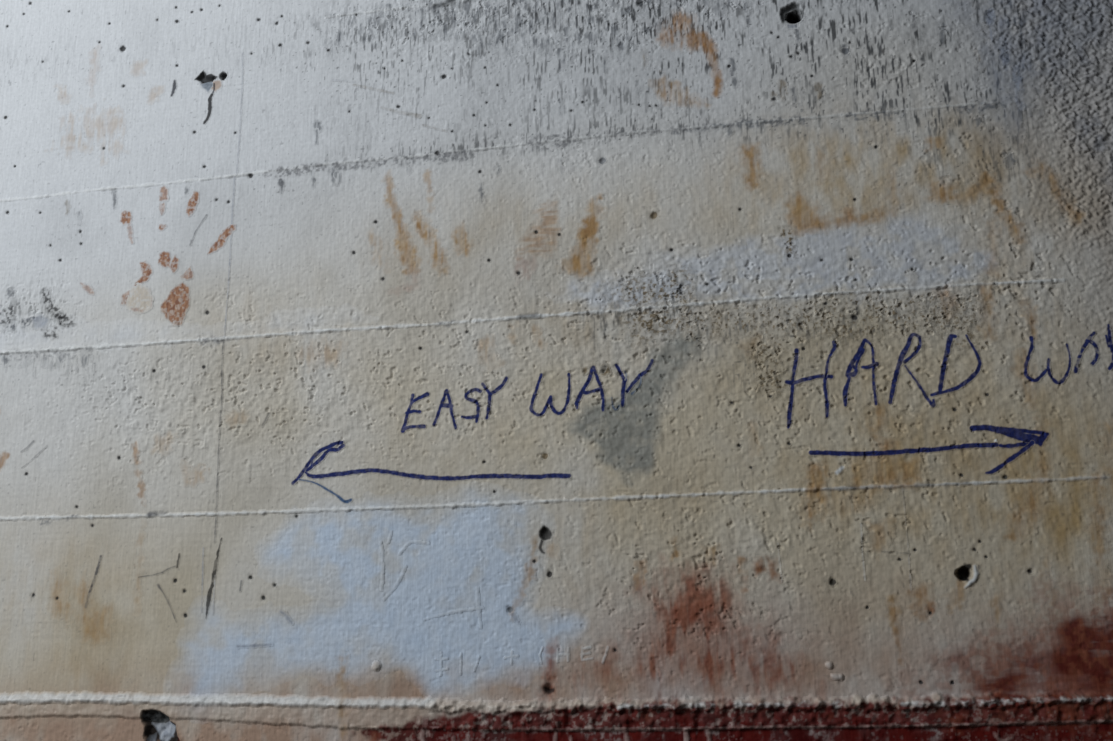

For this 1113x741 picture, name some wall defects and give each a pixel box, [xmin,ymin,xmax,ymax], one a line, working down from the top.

rust [647,7,725,111]
spalling [140,708,181,741]